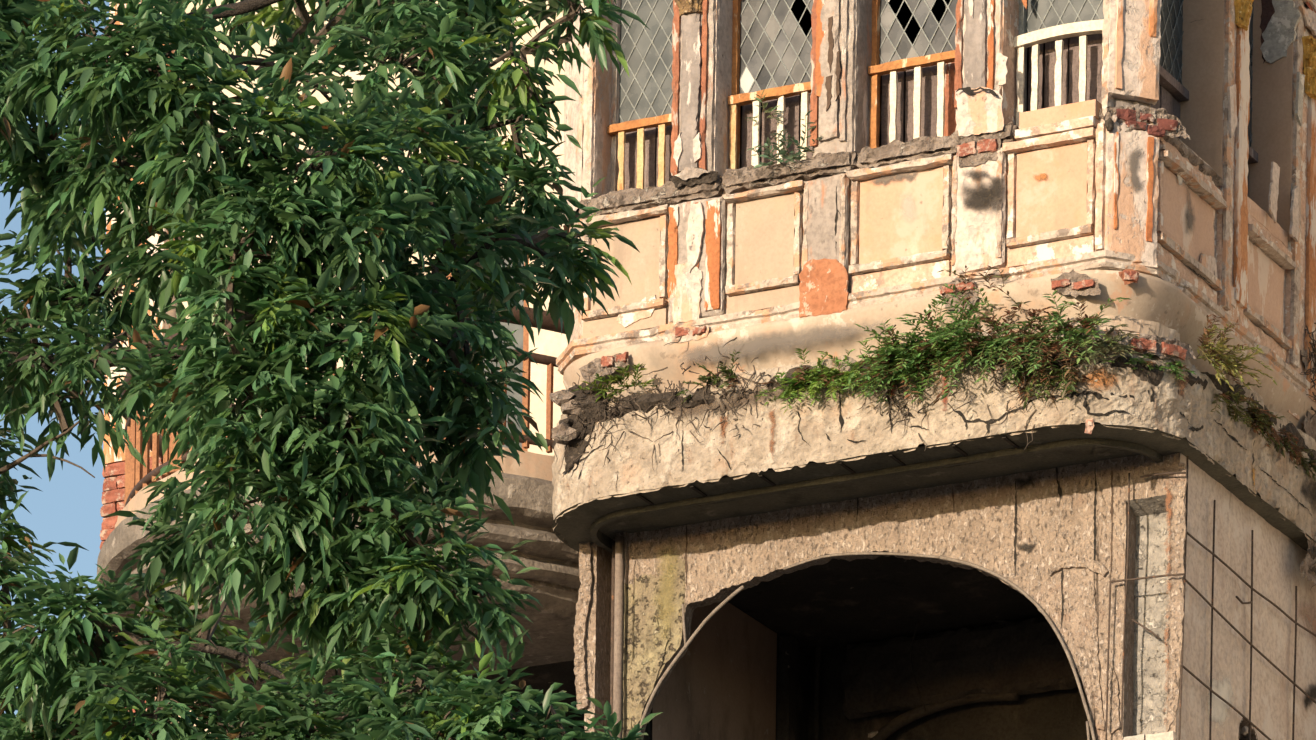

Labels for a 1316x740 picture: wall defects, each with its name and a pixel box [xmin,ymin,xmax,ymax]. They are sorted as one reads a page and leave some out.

peeling [1260,0,1316,64]
peeling [670,22,718,188]
spalling [1104,105,1191,140]
damp [963,170,1005,209]
peeling [616,202,709,345]
peeling [798,258,849,318]
spalling [1128,335,1197,364]
spalling [550,352,629,474]
crack [798,390,929,443]
crack [947,368,1312,516]
damp [1305,685,1316,708]